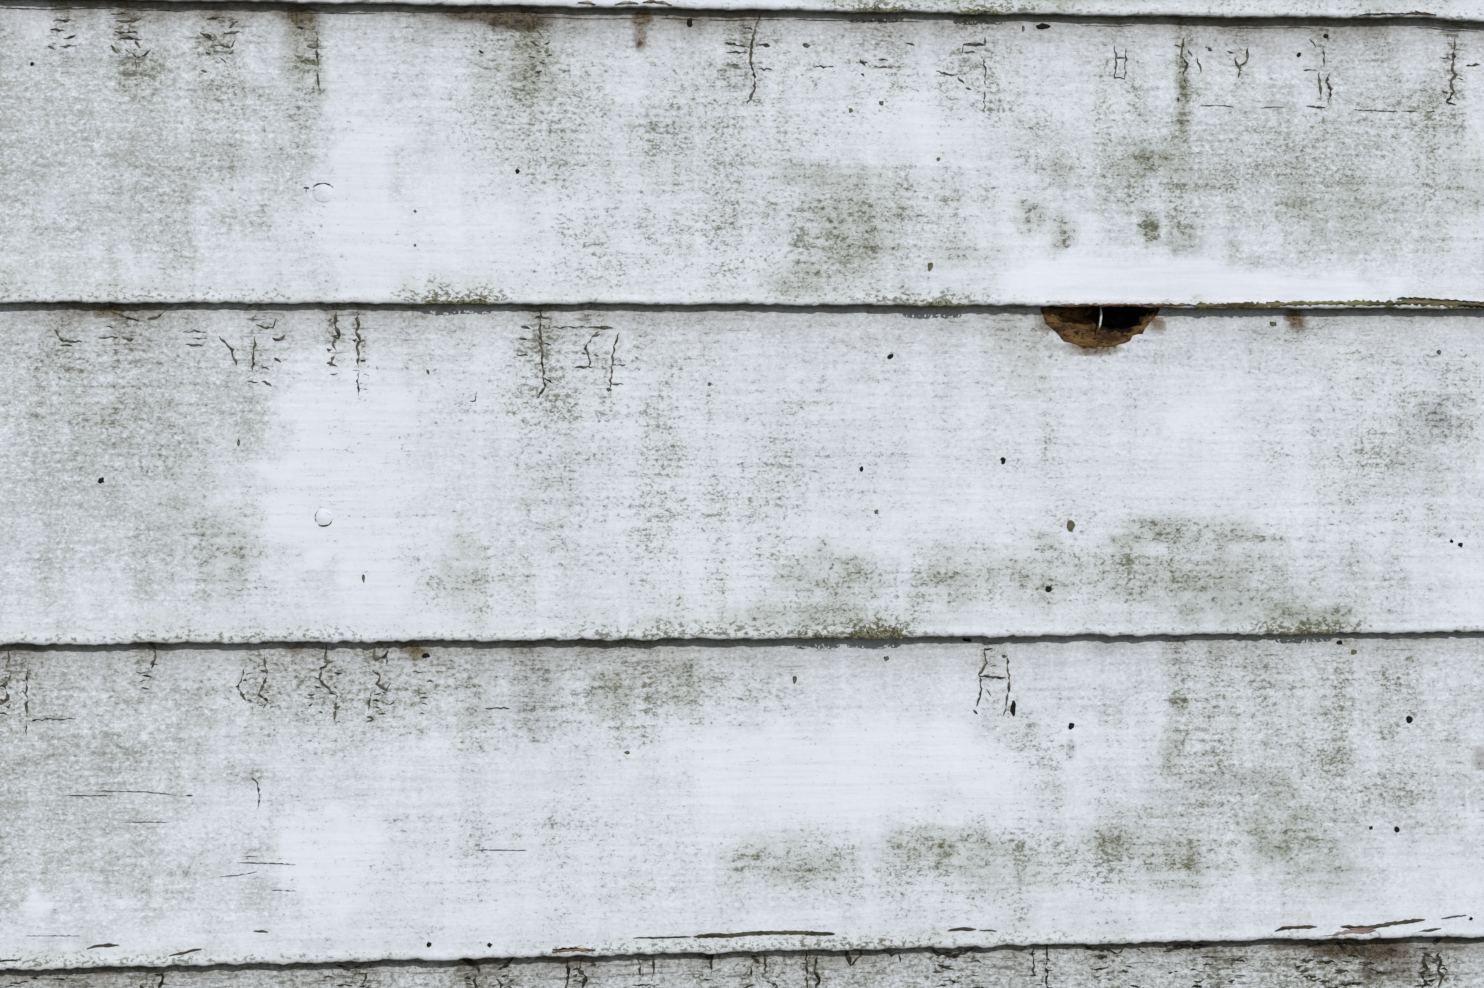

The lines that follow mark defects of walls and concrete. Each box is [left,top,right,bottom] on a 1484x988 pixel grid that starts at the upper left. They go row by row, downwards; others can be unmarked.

leakage [1176,61,1191,138]
crack [1176,27,1478,112]
mould [815,174,900,270]
leakage [1022,199,1075,248]
leakage [1137,213,1161,242]
crack [517,310,626,398]
leakage [922,520,1075,604]
leakage [1076,518,1243,606]
crack [0,650,76,735]
crack [236,654,268,712]
crack [308,644,433,723]
crack [974,648,1011,715]